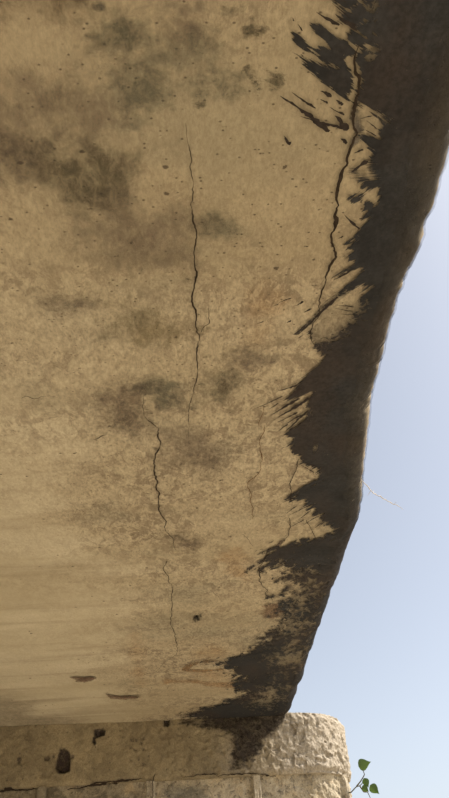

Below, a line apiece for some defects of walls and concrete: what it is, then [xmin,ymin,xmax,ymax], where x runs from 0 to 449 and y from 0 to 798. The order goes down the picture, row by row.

leakage [53,152,124,204]
crack [142,383,178,676]
crack [182,128,210,438]
leakage [178,0,449,768]
crack [310,46,361,344]
crack [0,785,41,793]
crack [67,775,155,798]